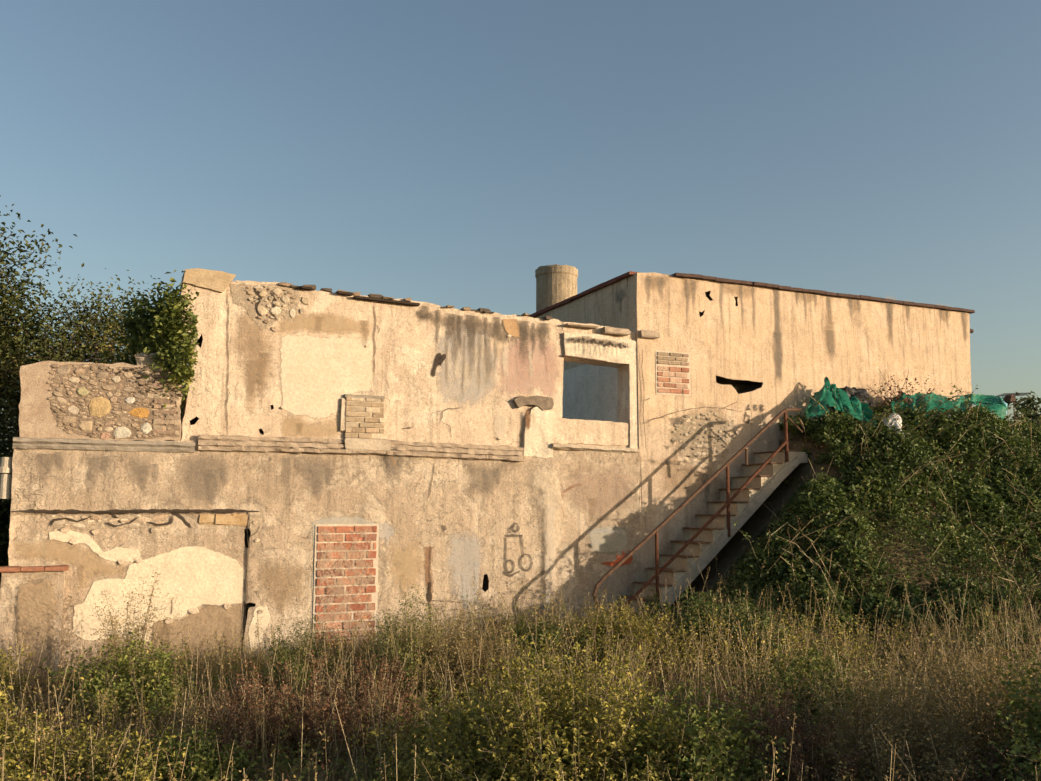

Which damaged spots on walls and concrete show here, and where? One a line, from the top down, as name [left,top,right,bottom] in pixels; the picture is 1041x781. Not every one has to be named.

crack [224,294,232,435]
flaking render [229,283,373,419]
crack [372,307,380,374]
damp [416,306,556,403]
damp [796,292,834,353]
flaking render [671,410,740,464]
flaking render [249,515,263,548]
flaking render [41,513,246,641]
flaking render [248,606,270,653]